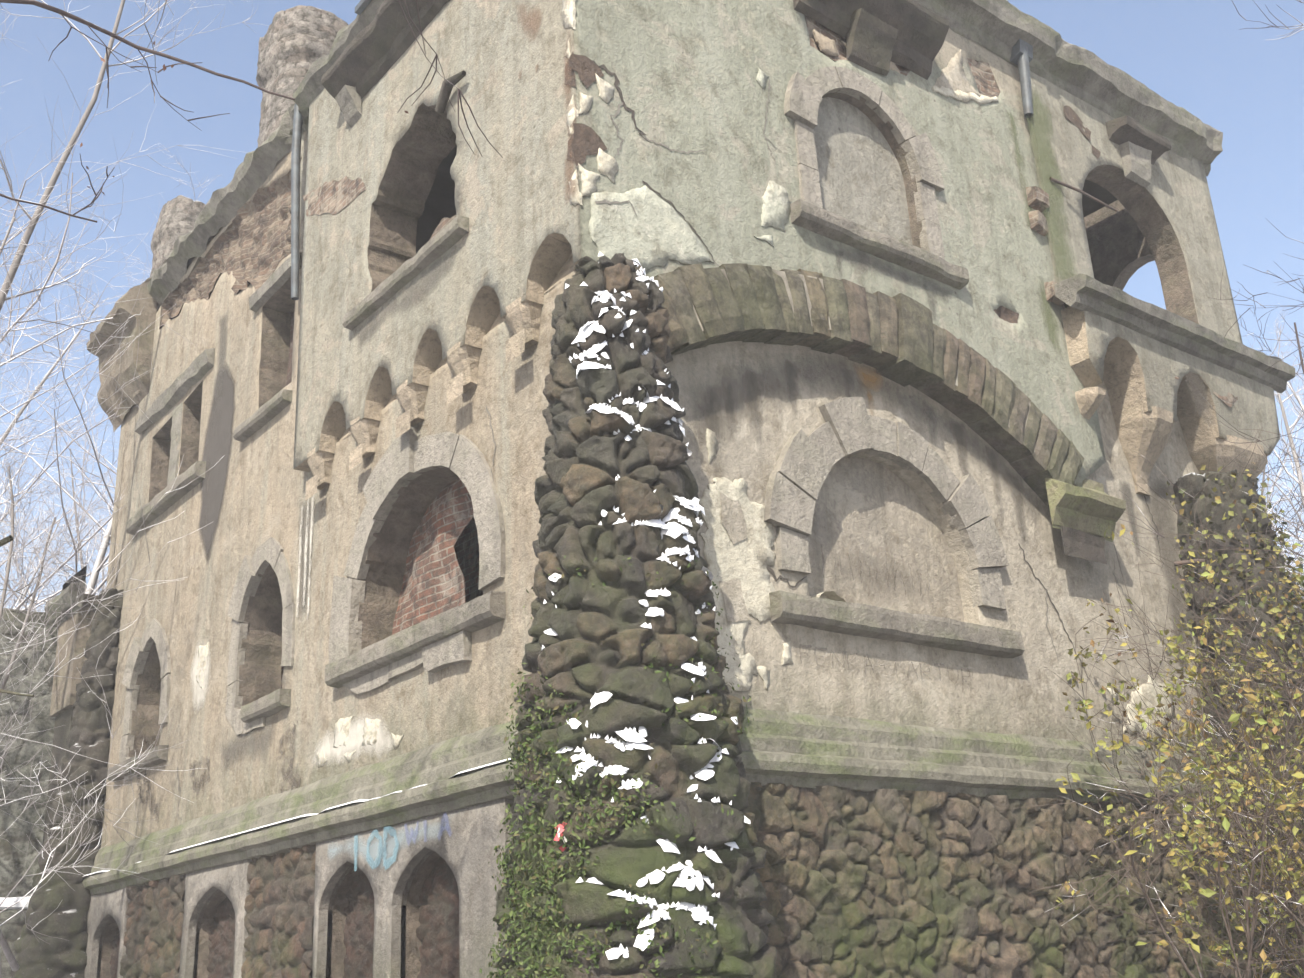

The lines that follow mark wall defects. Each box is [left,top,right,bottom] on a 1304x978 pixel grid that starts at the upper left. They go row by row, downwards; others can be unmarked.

peeling [562,0,719,271]
crack [593,60,701,158]
peeling [756,68,769,88]
peeling [932,49,1000,104]
spalling [159,158,366,329]
peeling [753,181,791,247]
peeling [705,428,718,462]
peeling [698,477,793,691]
crack [1018,543,1096,691]
peeling [192,642,209,705]
peeling [316,716,404,768]